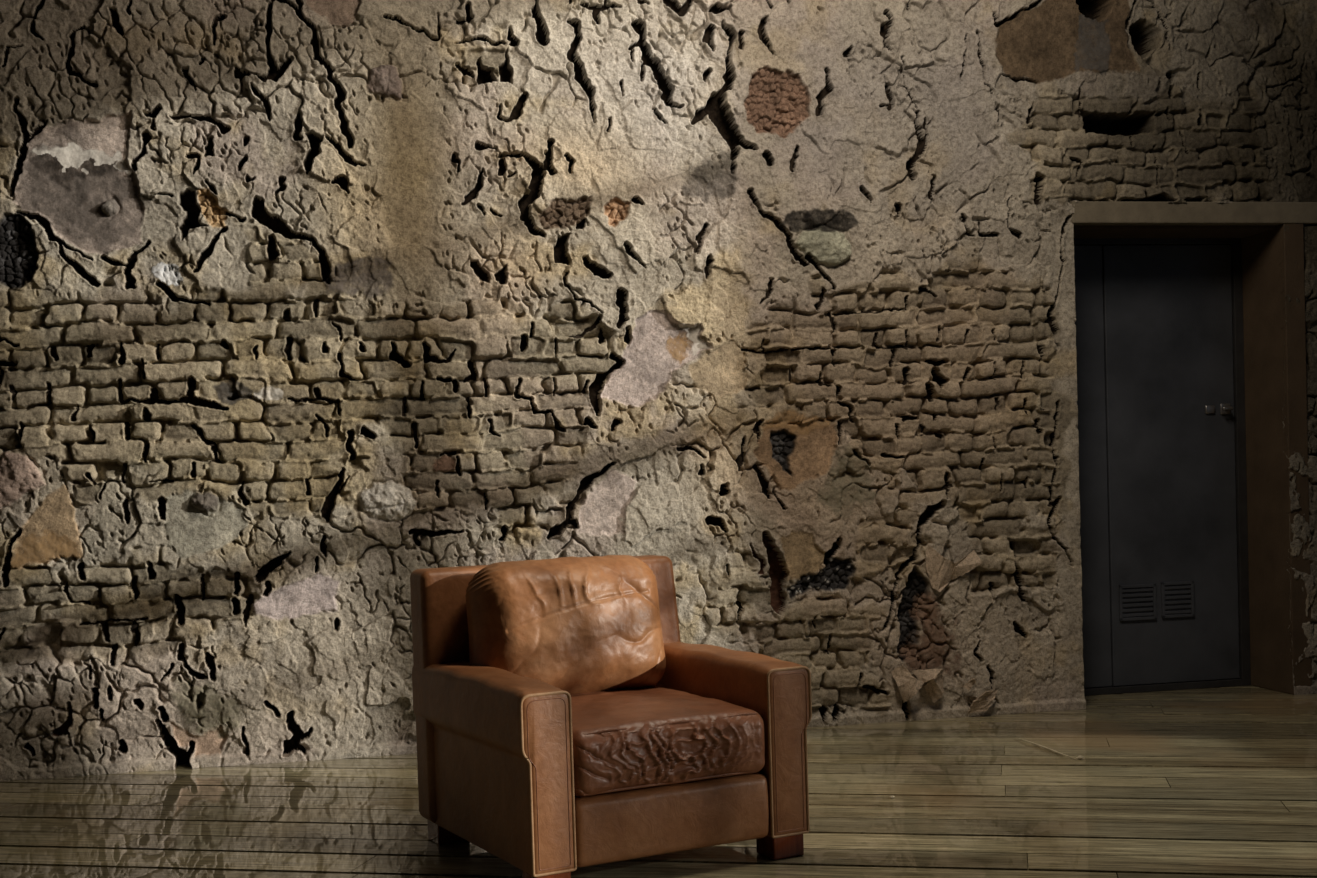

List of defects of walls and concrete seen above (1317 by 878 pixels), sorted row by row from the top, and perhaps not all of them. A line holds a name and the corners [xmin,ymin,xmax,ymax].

spalling [14,112,144,254]
crack [0,0,645,766]
spalling [600,311,747,407]
crack [383,0,1205,654]
spalling [770,429,796,475]
spalling [165,491,248,558]
spalling [578,469,636,536]
spalling [779,532,855,598]
flaking render [926,545,982,592]
crack [819,673,910,723]
flaking render [892,665,944,703]
crack [973,641,994,689]